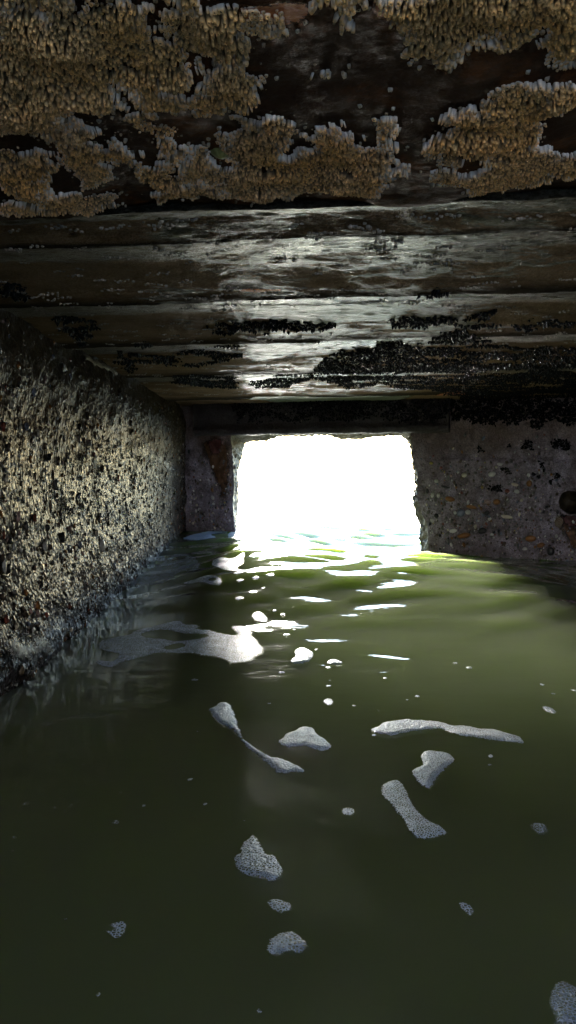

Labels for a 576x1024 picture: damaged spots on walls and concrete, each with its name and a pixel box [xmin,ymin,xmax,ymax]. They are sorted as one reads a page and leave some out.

corrosion [203,439,230,501]